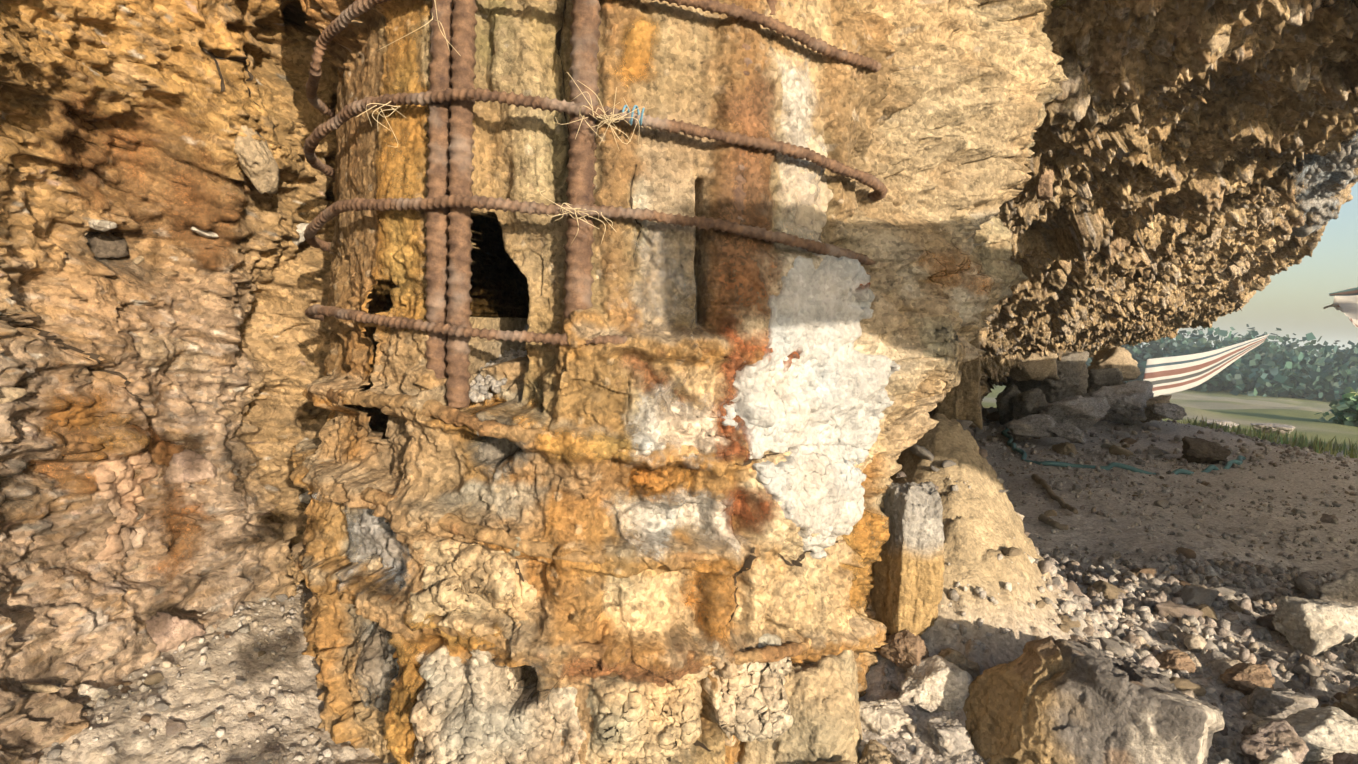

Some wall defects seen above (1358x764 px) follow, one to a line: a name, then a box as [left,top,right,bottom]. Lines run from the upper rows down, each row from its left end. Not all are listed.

corrosion [621,19,658,80]
corrosion [376,22,429,322]
corrosion [700,77,800,460]
spalling [622,353,689,407]
peeling [716,134,900,560]
spalling [475,431,526,480]
spalling [348,509,407,582]
spalling [619,490,741,553]
corrosion [724,490,777,528]
spalling [355,622,399,711]